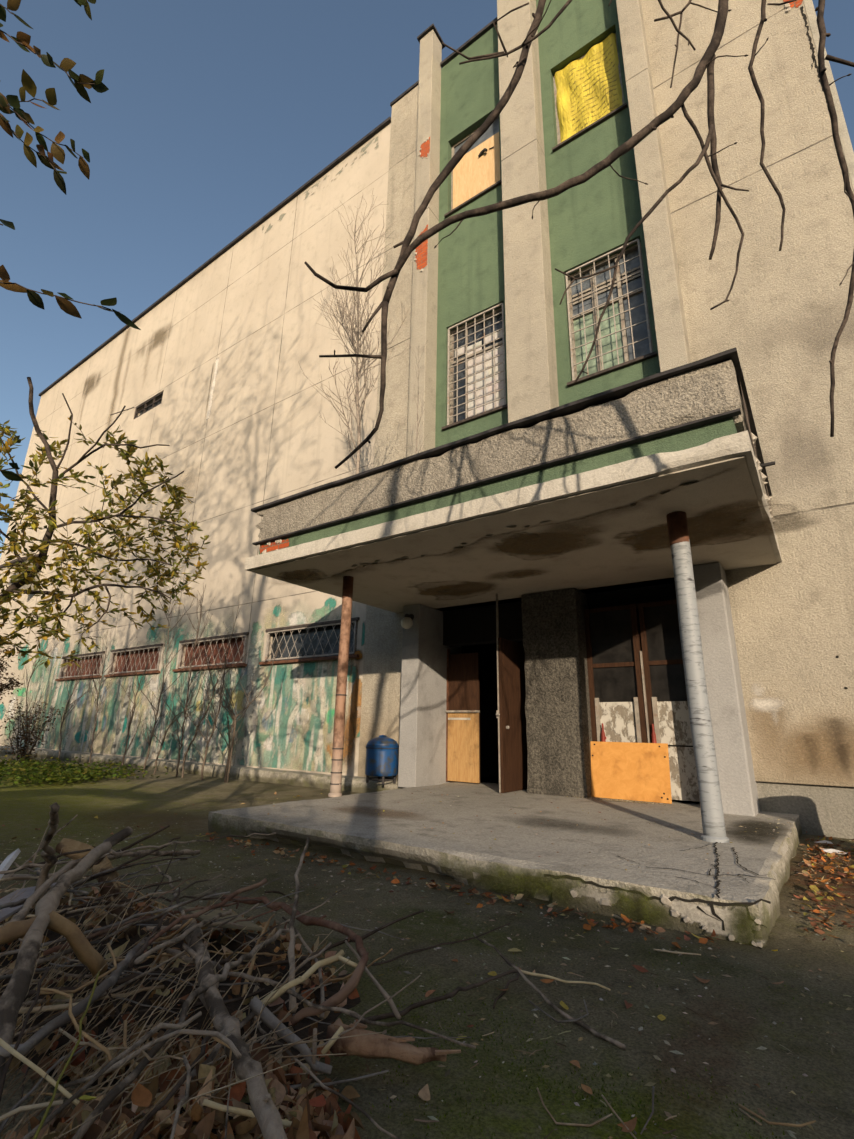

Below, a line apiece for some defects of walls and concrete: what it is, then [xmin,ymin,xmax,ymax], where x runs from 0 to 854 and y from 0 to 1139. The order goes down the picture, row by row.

spalling [783,0,803,13]
spalling [419,137,430,159]
spalling [414,225,428,272]
water stain [617,524,670,551]
water stain [687,503,811,547]
water stain [416,527,597,600]
crack [544,842,775,931]